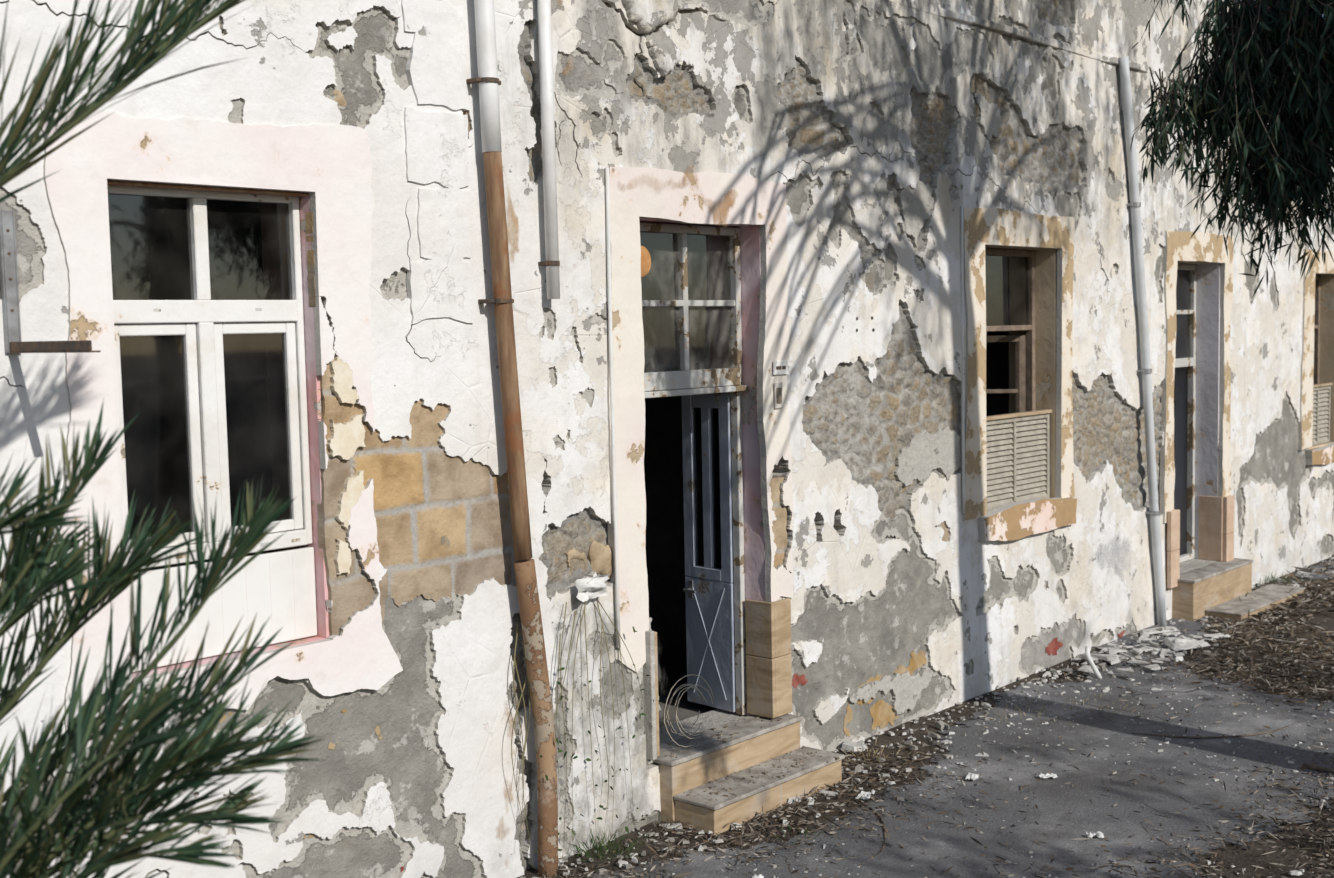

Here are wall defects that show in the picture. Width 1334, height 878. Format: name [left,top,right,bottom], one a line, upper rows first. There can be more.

flaking render [305,7,409,128]
flaking render [0,188,45,299]
flaking render [1236,395,1334,542]
flaking render [1319,535,1334,557]
flaking render [215,356,517,878]